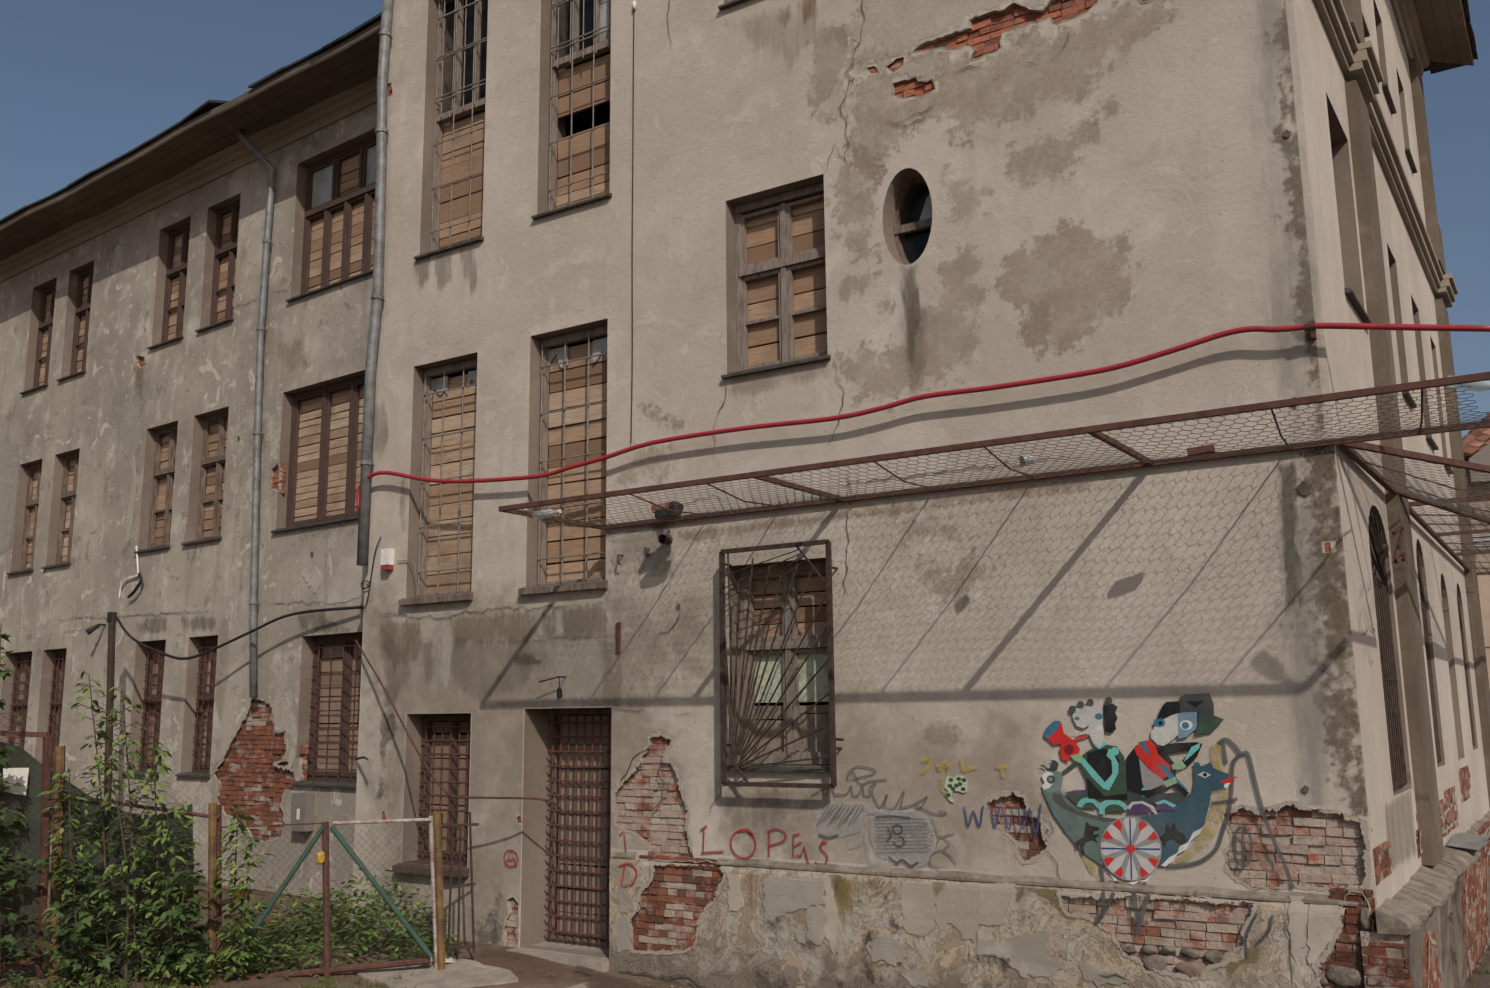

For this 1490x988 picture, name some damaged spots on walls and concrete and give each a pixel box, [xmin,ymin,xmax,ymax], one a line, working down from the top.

crack [827,0,865,167]
flaking render [845,0,1174,185]
damp [1265,2,1320,381]
damp [904,275,919,359]
damp [1283,448,1368,816]
flaking render [159,688,308,844]
flaking render [612,732,744,955]
peeling [762,875,840,988]
flaking render [866,785,1443,988]